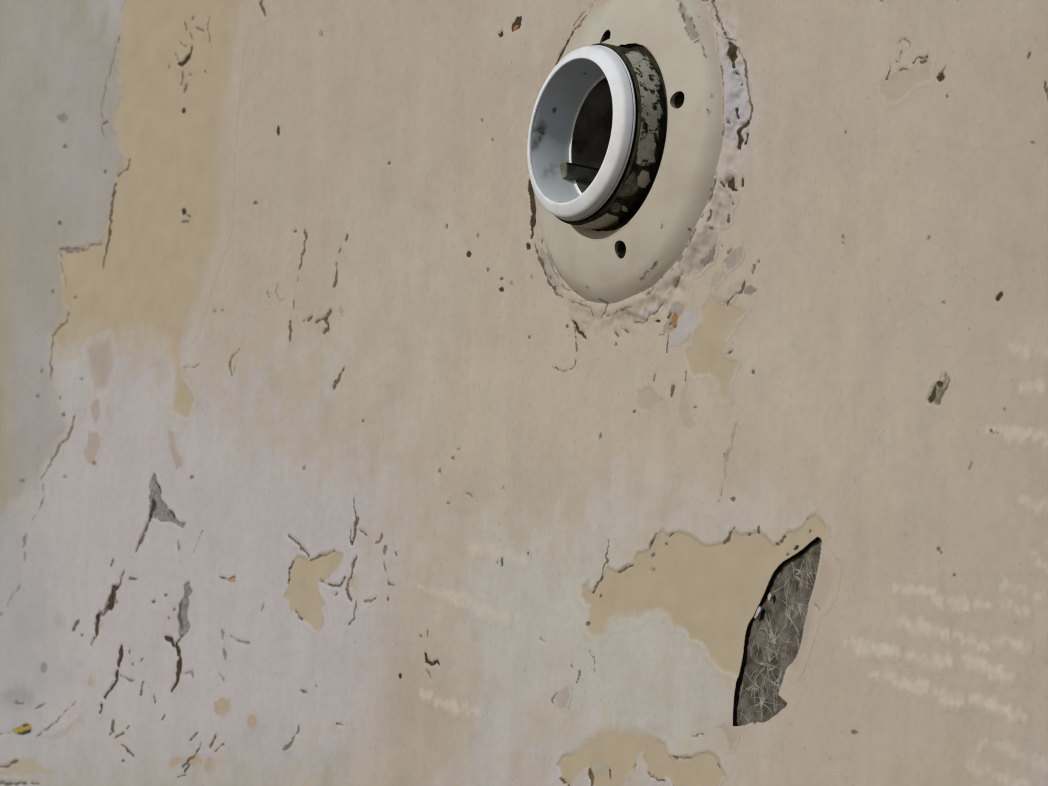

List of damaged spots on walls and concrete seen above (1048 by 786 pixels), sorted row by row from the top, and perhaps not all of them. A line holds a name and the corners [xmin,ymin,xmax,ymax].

peeling [574,50,663,230]
damp [81,328,119,469]
spalling [928,373,950,404]
spalling [149,474,186,528]
crack [72,518,165,762]
peeling [282,549,358,634]
crack [321,506,397,625]
peeling [579,508,842,726]
damp [840,543,1048,786]
crack [178,732,224,777]
peeling [555,711,727,786]